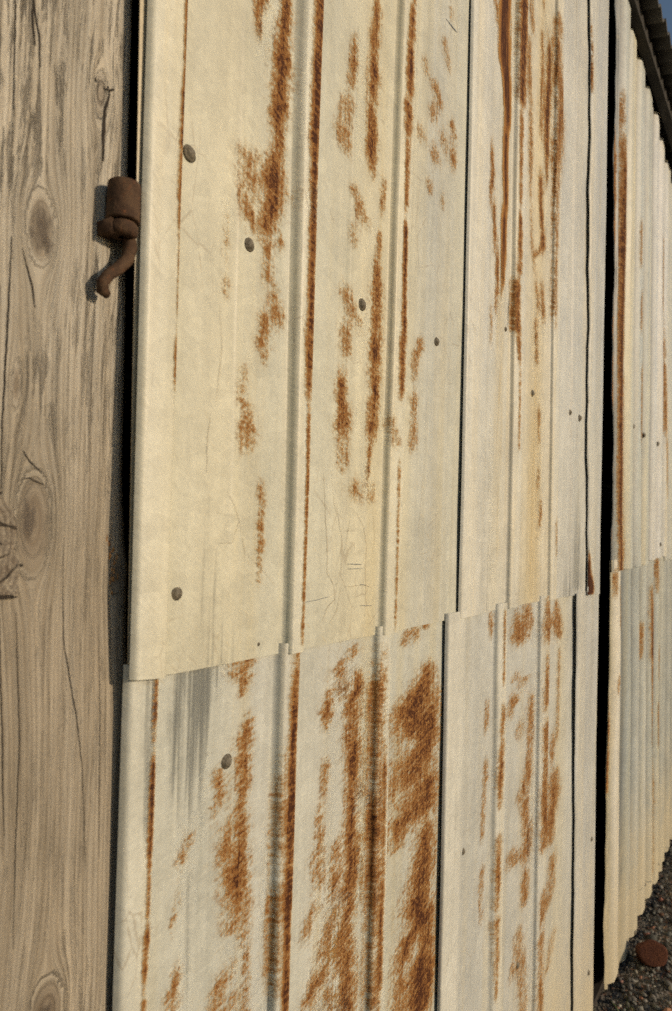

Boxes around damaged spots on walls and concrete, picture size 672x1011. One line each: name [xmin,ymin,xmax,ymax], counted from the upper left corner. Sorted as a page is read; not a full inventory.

corrosion [164,967,180,1011]
corrosion [208,712,255,1011]
corrosion [228,659,256,697]
corrosion [237,368,256,452]
corrosion [256,483,266,583]
corrosion [237,0,294,364]
corrosion [263,0,457,1011]
corrosion [478,597,563,1011]
corrosion [489,0,565,449]
corrosion [611,94,627,625]